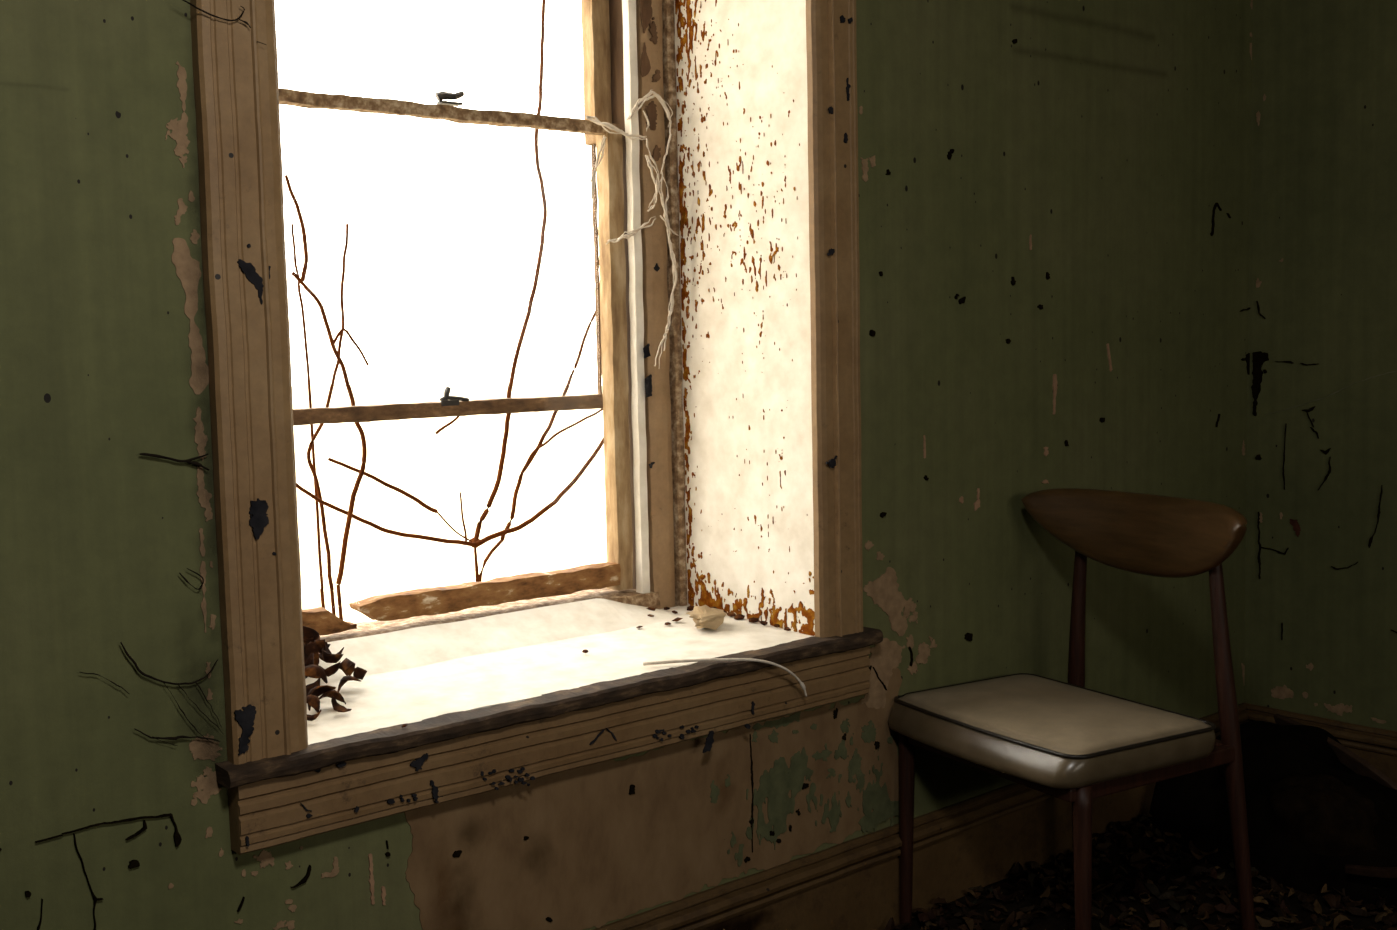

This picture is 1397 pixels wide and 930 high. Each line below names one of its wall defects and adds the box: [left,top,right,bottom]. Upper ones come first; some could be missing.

peeling [639,0,815,636]
crack [35,813,182,930]
peeling [241,836,339,930]
flaking render [387,540,937,930]